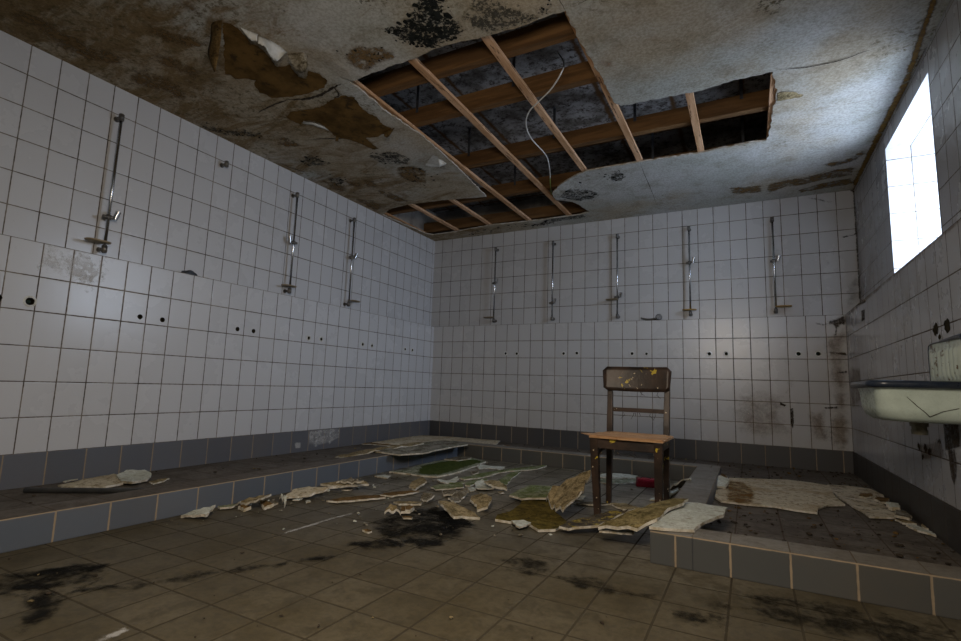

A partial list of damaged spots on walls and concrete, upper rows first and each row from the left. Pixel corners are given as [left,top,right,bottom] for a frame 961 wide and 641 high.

water stain [384,0,551,48]
peeling [208,20,327,98]
water stain [336,46,394,70]
peeling [286,95,394,150]